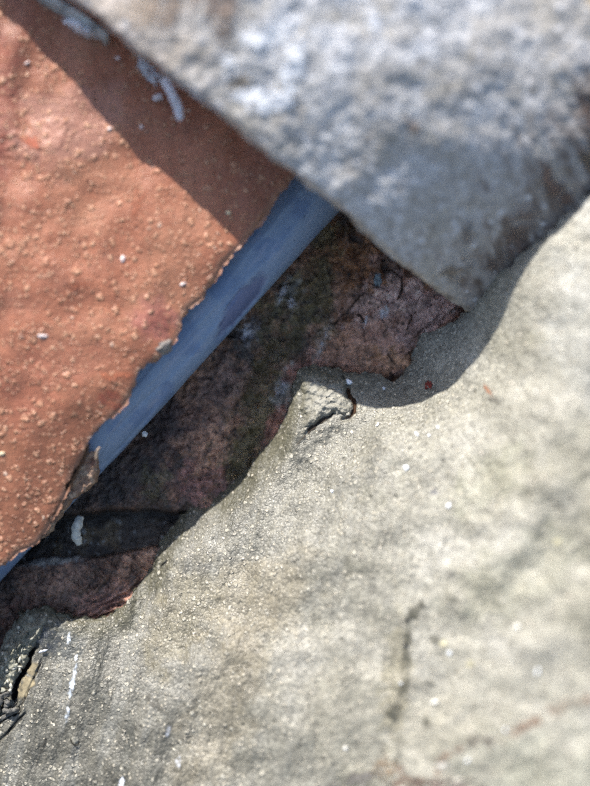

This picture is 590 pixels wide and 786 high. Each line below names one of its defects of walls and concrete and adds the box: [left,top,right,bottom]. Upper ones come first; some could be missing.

spalling [39,444,100,542]
spalling [0,609,48,722]
spalling [345,760,476,786]